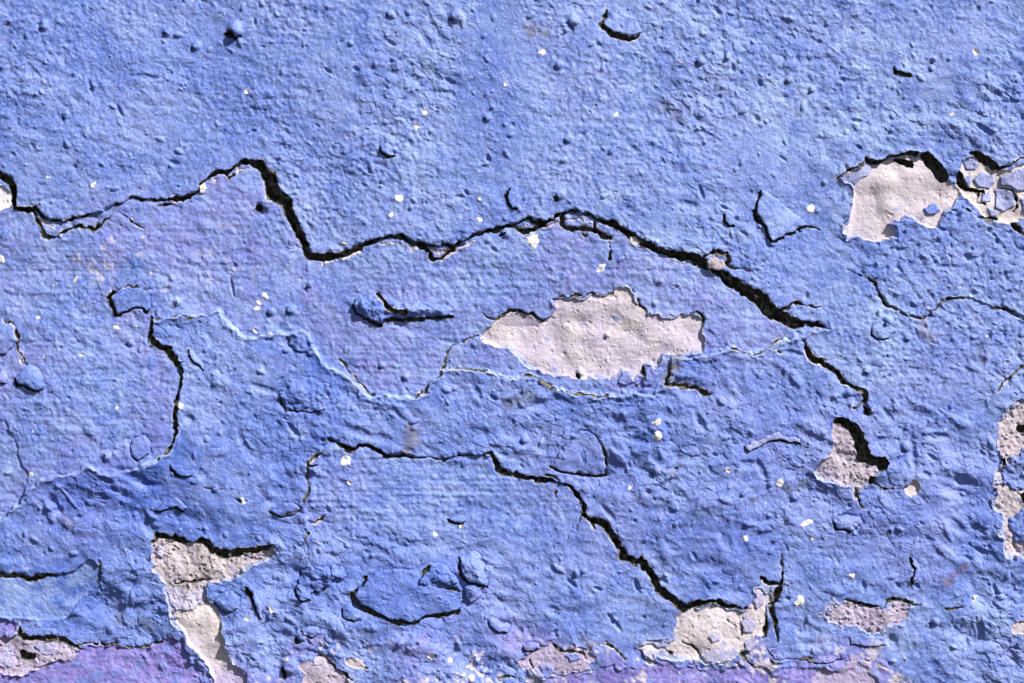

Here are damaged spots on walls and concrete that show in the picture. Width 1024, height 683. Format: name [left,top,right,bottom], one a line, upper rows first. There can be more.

crack [147,314,205,461]
peeling [0,164,832,520]
crack [0,158,871,411]
spalling [814,410,890,493]
peeling [836,150,1024,318]
crack [858,274,1024,320]
spalling [0,634,80,677]
spalling [150,532,278,683]
crack [317,654,369,681]
crack [204,438,817,666]
crack [499,659,534,679]
spalling [638,580,918,683]